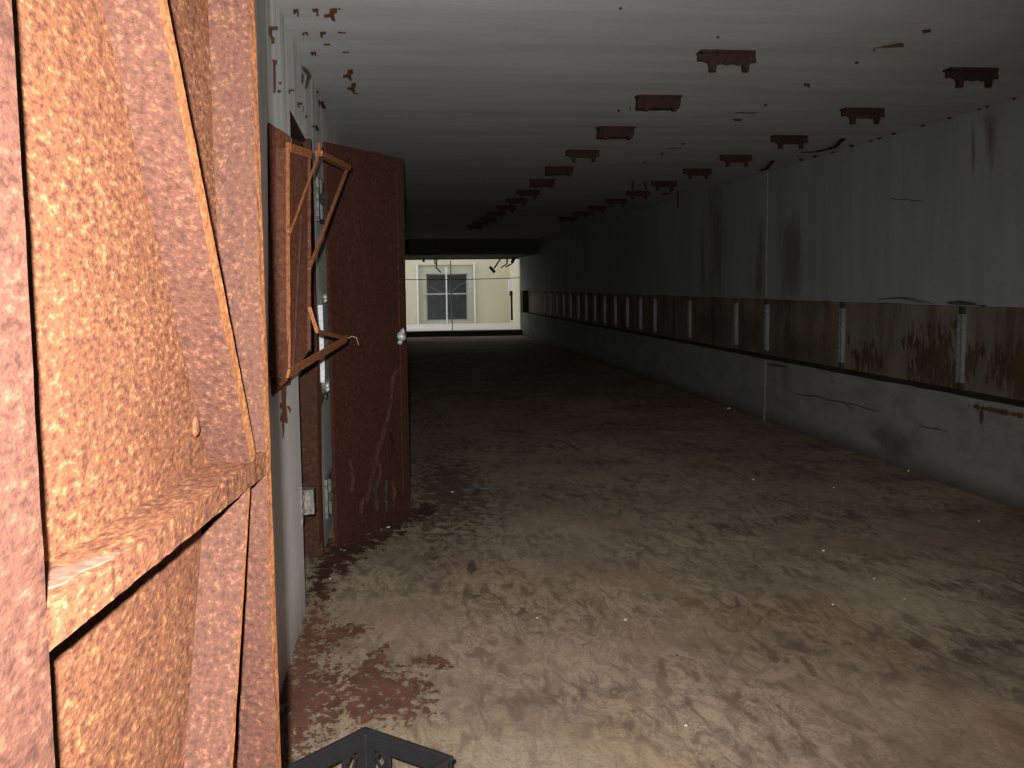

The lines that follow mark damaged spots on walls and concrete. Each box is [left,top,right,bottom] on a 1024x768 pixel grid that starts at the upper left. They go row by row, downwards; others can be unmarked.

rust [302,8,346,56]
rust [273,60,308,118]
rust [343,69,359,95]
rust [901,315,985,388]
rust [192,415,200,438]
rust [272,378,291,437]
rust [973,404,1023,423]
rust [279,315,454,768]